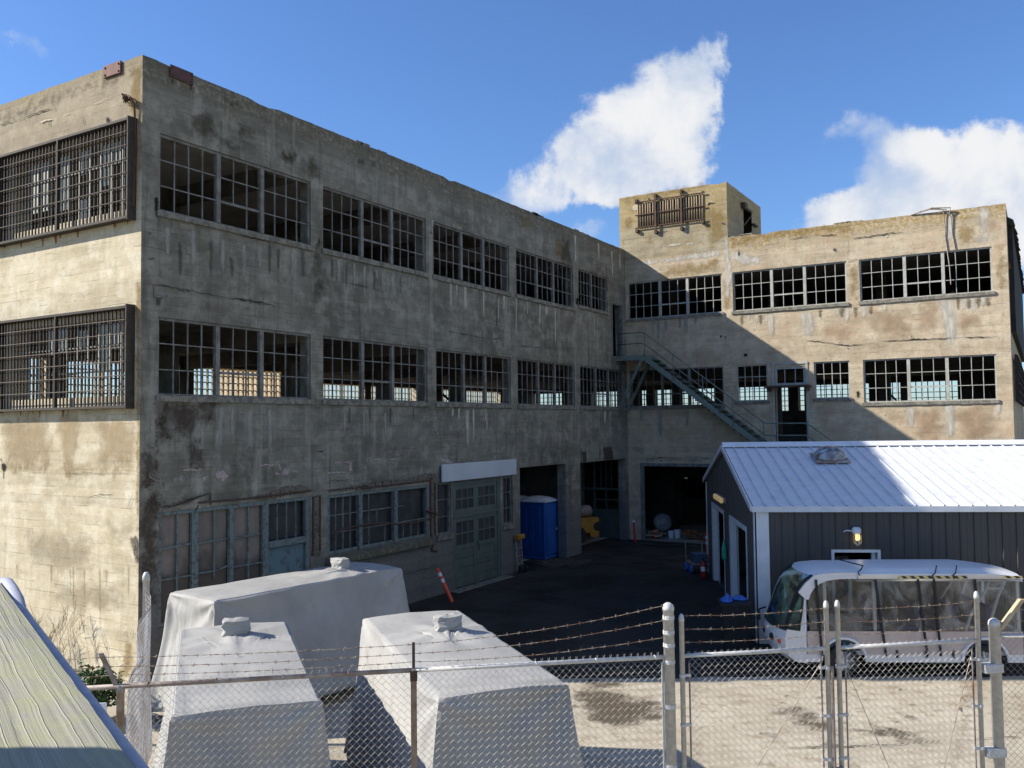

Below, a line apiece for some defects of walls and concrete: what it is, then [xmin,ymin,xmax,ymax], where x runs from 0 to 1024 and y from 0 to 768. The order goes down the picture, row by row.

crack [162,285,276,308]
crack [806,336,996,349]